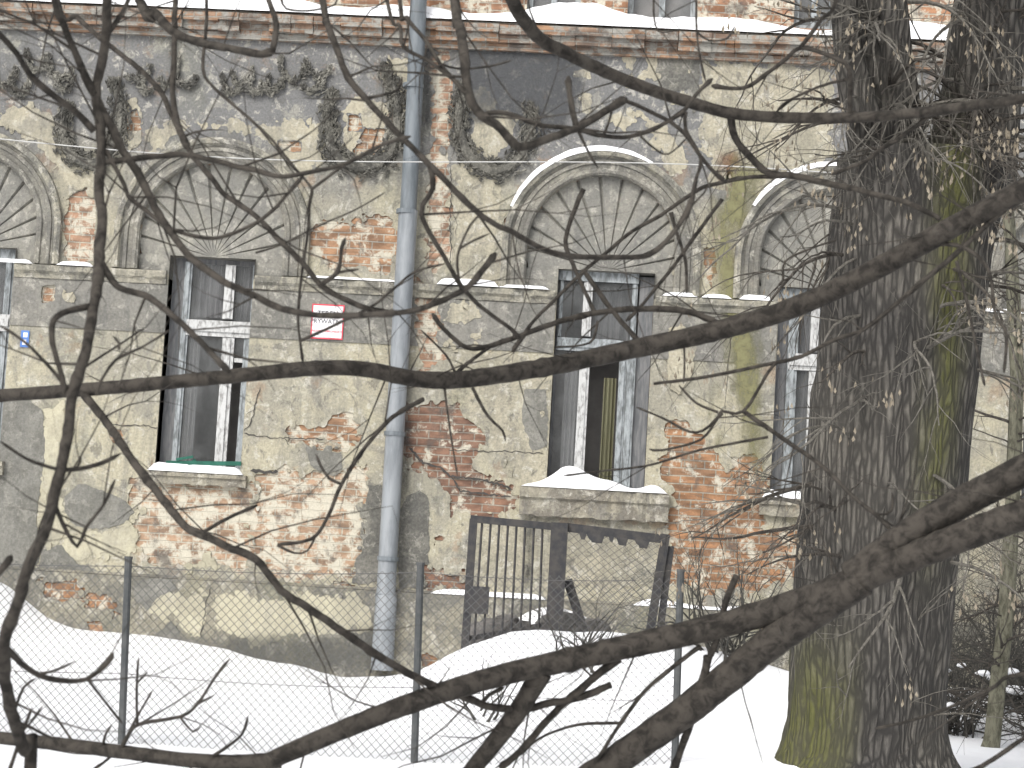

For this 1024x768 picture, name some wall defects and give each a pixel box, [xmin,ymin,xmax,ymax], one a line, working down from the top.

peeling [341,55,408,156]
peeling [0,101,96,267]
spalling [310,213,397,275]
spalling [414,298,538,372]
crack [244,390,323,445]
spalling [33,399,373,649]
crack [250,467,278,475]
spalling [403,378,551,593]
spalling [565,415,797,596]